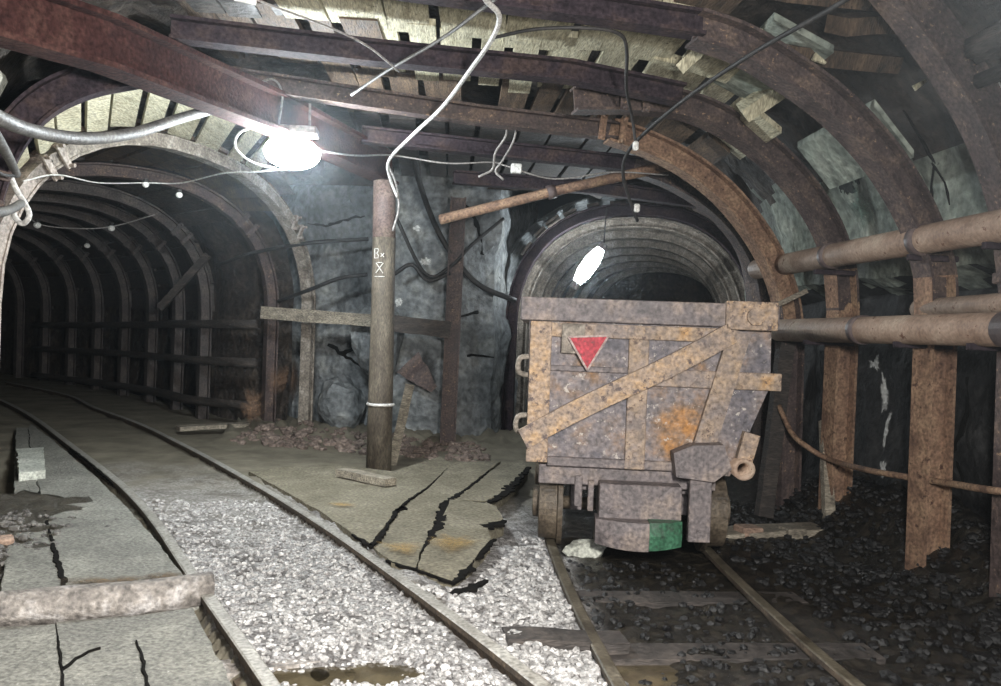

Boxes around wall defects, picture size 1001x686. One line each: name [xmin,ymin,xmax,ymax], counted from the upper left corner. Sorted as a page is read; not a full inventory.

crack [38,491,68,586]
crack [351,467,531,596]
crack [57,636,101,686]
crack [136,640,150,686]